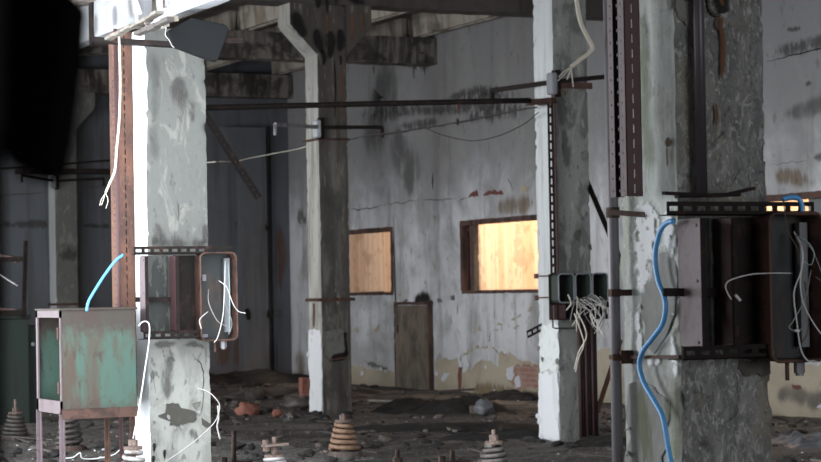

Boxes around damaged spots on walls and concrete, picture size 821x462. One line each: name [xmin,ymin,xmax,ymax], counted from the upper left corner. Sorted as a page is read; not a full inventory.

leakage [371,87,517,129]
crack [350,198,466,211]
peeling [637,251,678,354]
peeling [158,401,211,429]
peeling [434,323,561,442]
peeling [738,360,821,418]